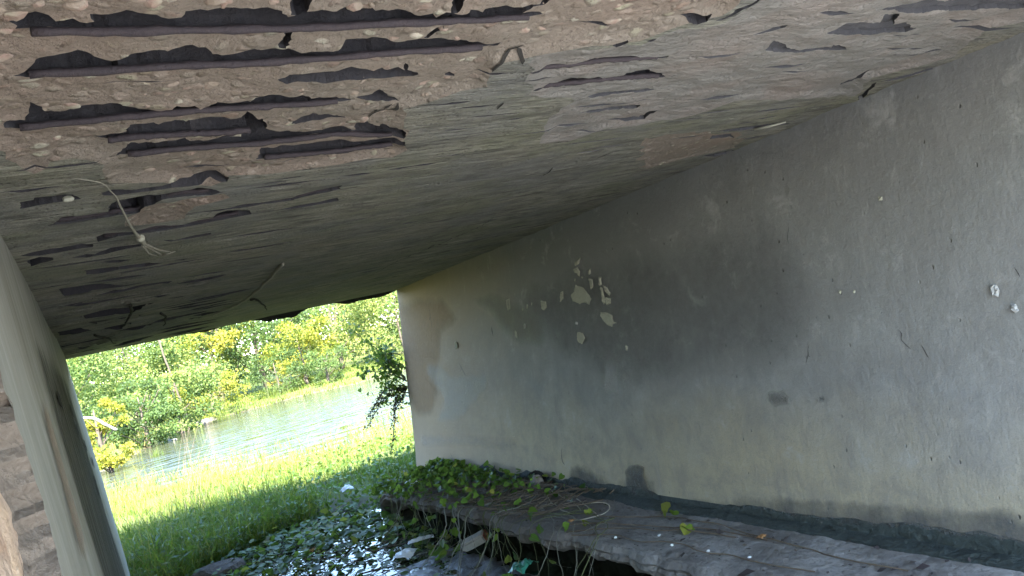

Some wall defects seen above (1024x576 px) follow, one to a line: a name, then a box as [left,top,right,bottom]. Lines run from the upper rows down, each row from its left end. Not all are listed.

spalling [0,0,1024,354]